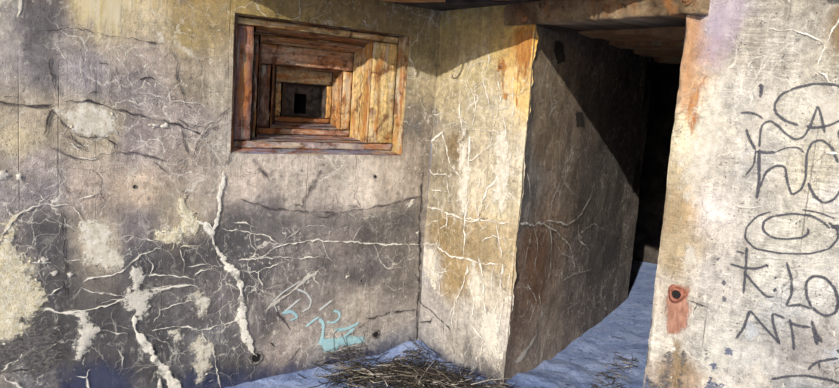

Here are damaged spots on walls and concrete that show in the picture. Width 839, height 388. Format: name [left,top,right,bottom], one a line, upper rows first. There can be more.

corrosion [498,28,533,107]
peeling [0,212,69,377]
peeling [78,219,125,272]
crack [0,27,601,388]
corrosion [666,286,689,388]